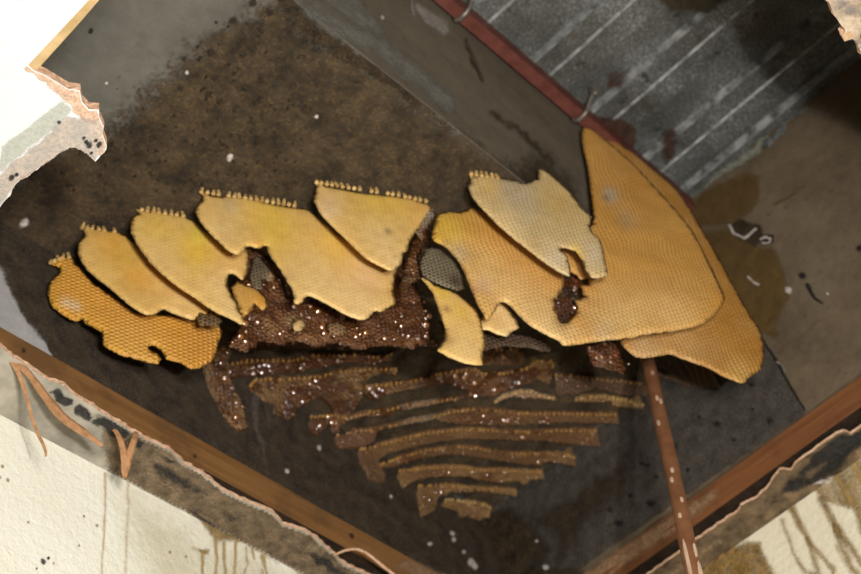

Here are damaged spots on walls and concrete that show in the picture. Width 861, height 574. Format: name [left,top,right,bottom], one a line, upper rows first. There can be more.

damp [0,0,671,574]
damp [693,173,788,339]
damp [654,346,805,494]
damp [699,539,773,574]
damp [781,430,861,574]